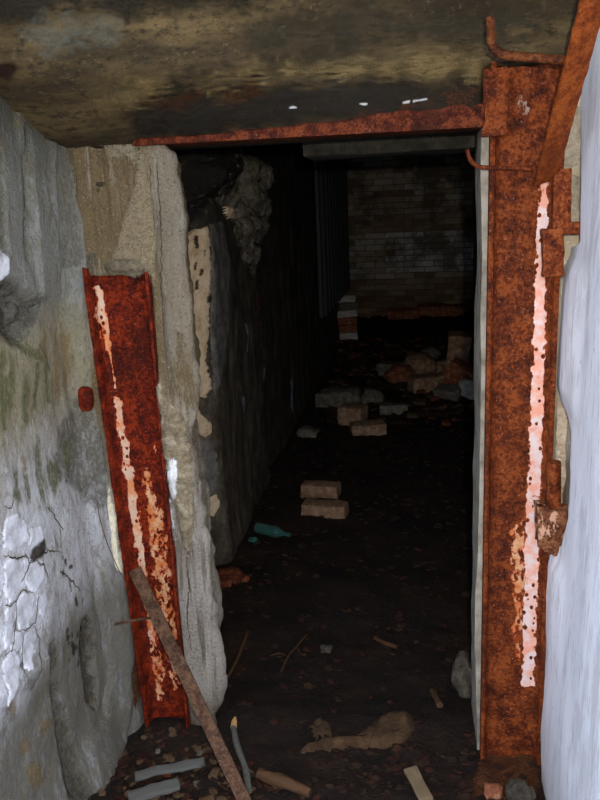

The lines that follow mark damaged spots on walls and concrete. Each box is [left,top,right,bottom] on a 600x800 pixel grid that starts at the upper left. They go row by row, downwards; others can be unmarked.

spalling [188,147,276,398]
crack [5,546,80,690]
rust [132,657,141,709]